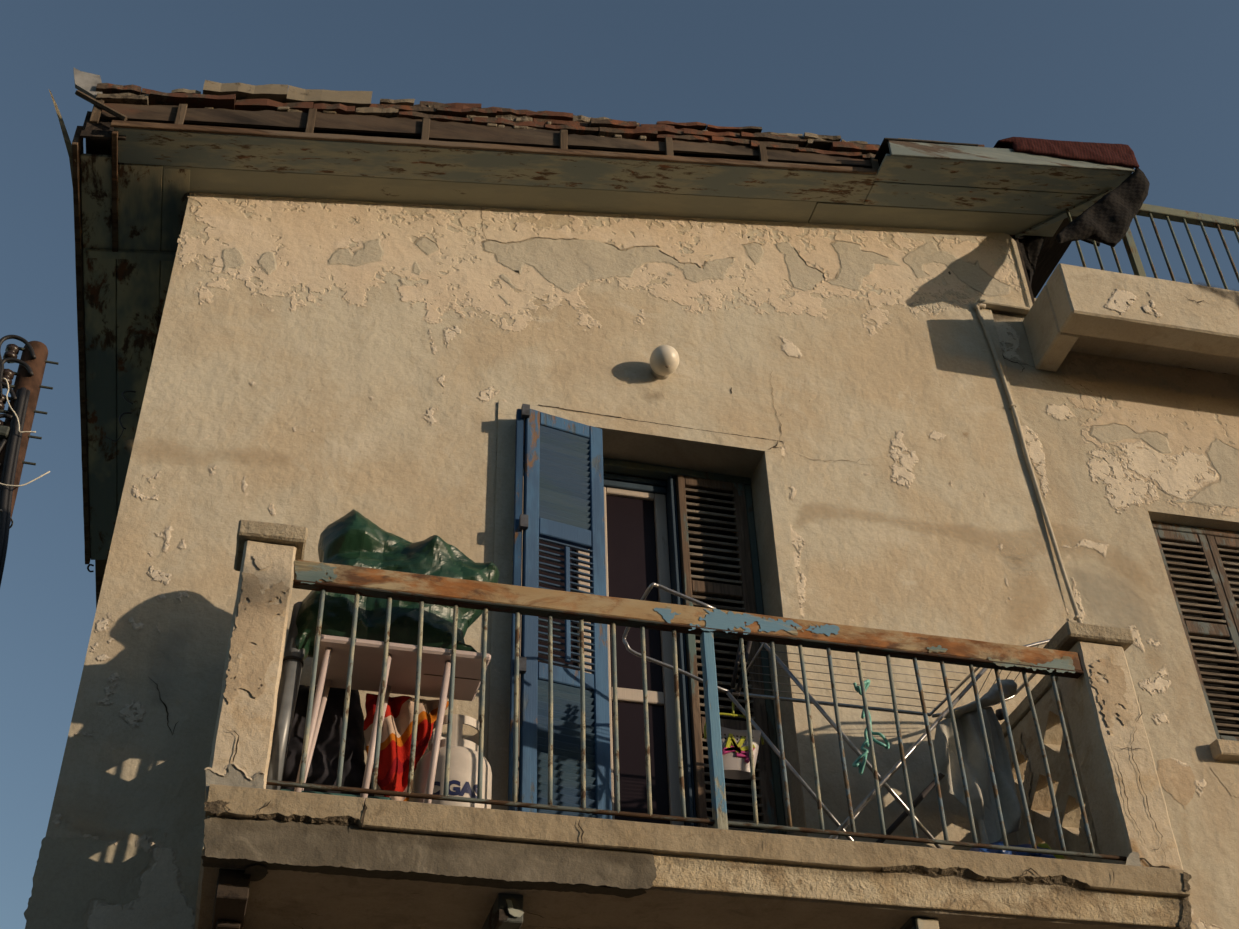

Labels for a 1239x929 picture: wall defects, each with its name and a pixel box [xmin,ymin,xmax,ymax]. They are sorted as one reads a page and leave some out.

peeling [176,192,1027,354]
water stain [1198,284,1239,304]
peeling [887,430,919,489]
peeling [1021,424,1051,498]
peeling [1045,354,1239,517]
peeling [147,526,189,602]
spalling [223,553,290,704]
crack [152,680,179,733]
spalling [1179,872,1225,929]